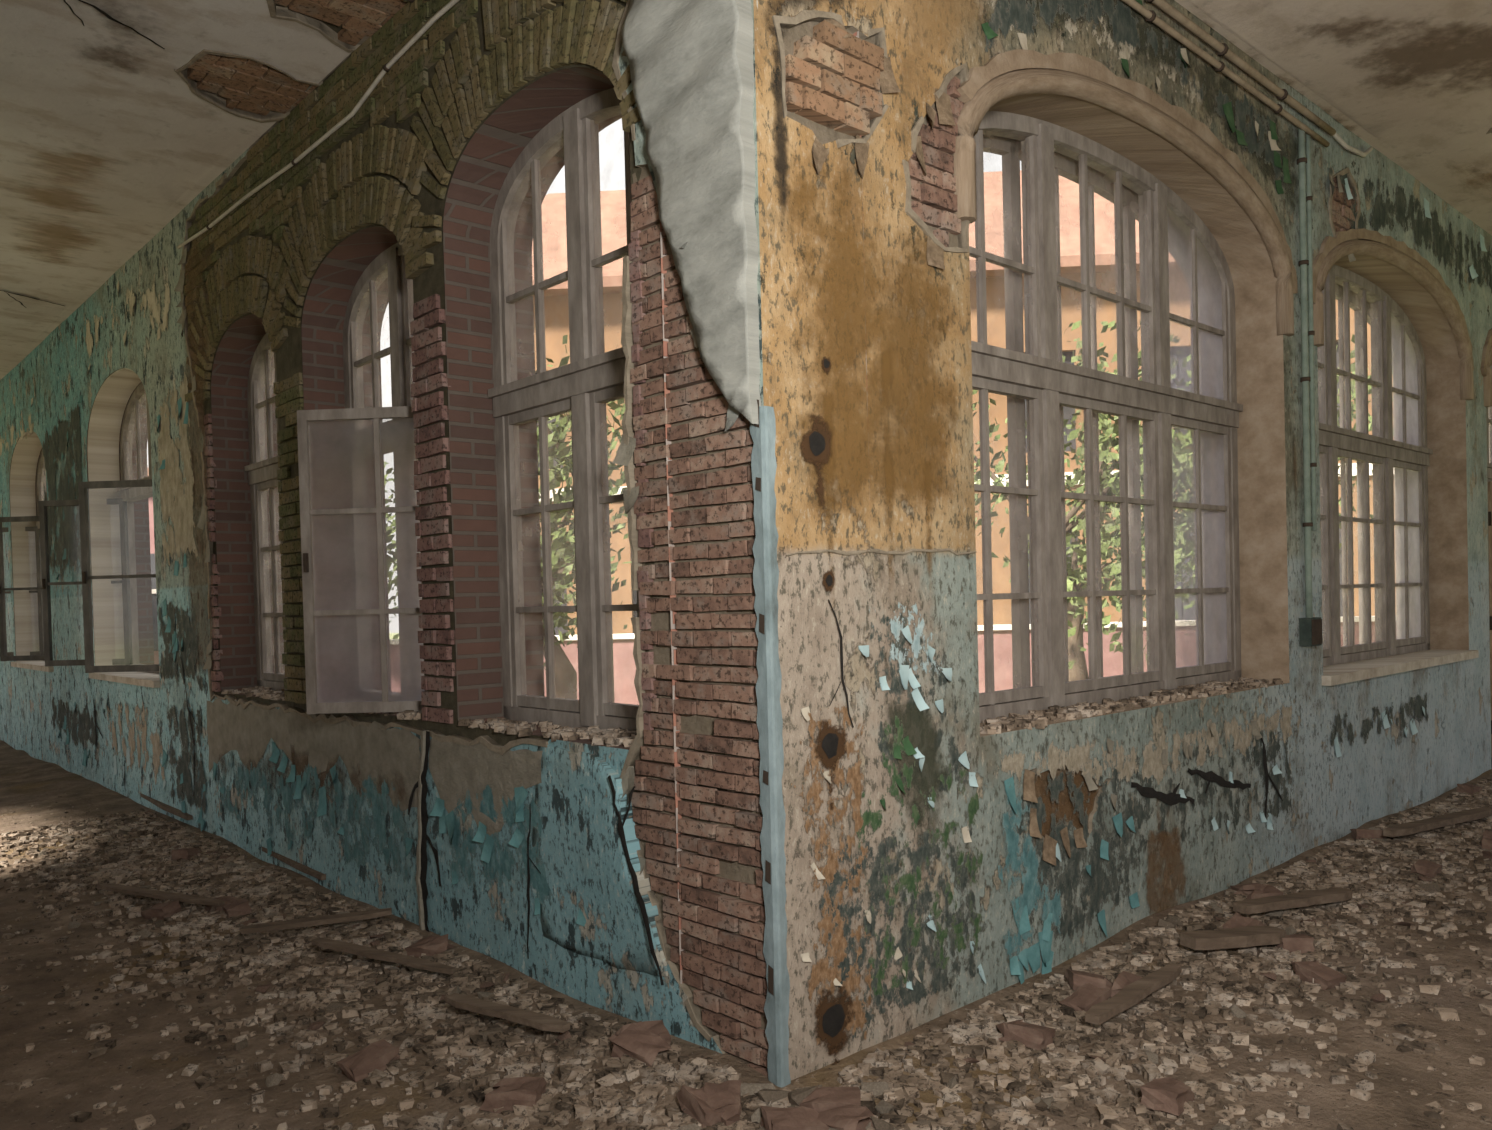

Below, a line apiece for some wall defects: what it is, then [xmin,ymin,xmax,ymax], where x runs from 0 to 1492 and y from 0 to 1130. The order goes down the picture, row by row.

crack [63,0,164,49]
flaking render [772,10,901,179]
peeling [981,0,1292,194]
damp [1384,30,1492,84]
damp [772,0,957,521]
peeling [0,395,82,582]
flaking render [52,0,769,1077]
peeling [1330,687,1429,758]
crack [408,730,441,932]
crack [608,775,664,985]
peeling [790,603,1294,1041]